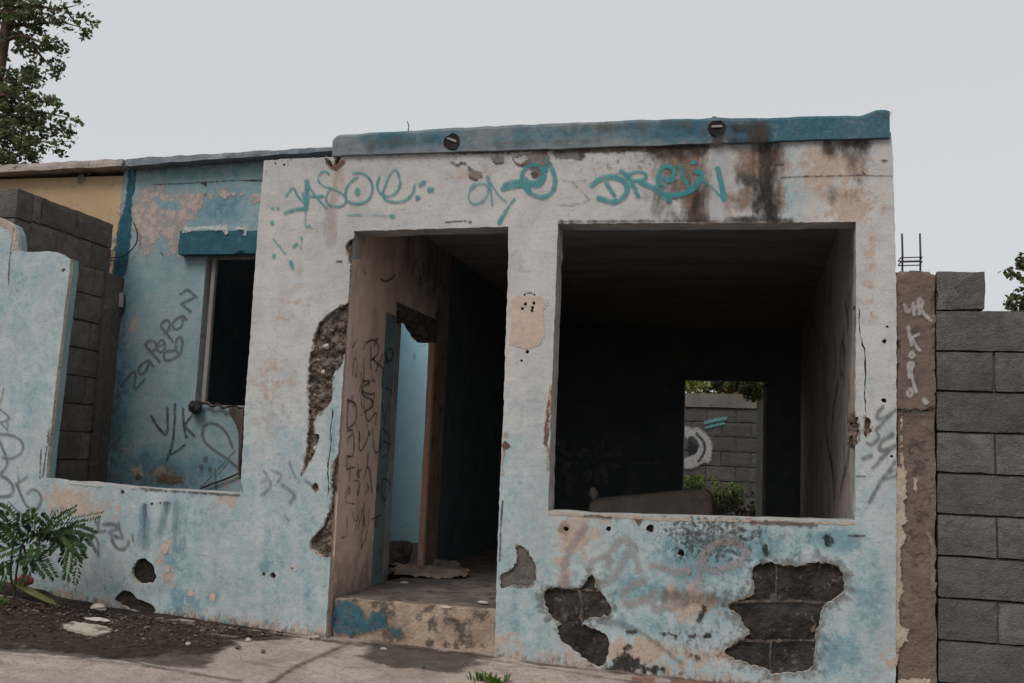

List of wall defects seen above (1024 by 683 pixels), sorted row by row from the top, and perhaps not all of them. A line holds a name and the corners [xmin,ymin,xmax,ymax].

leakage [824,140,869,163]
peeling [116,182,261,258]
crack [853,305,866,403]
spalling [300,302,349,558]
spalling [847,412,873,449]
spalling [134,542,170,583]
spalling [116,590,155,612]
spalling [499,544,612,667]
spalling [724,561,844,676]